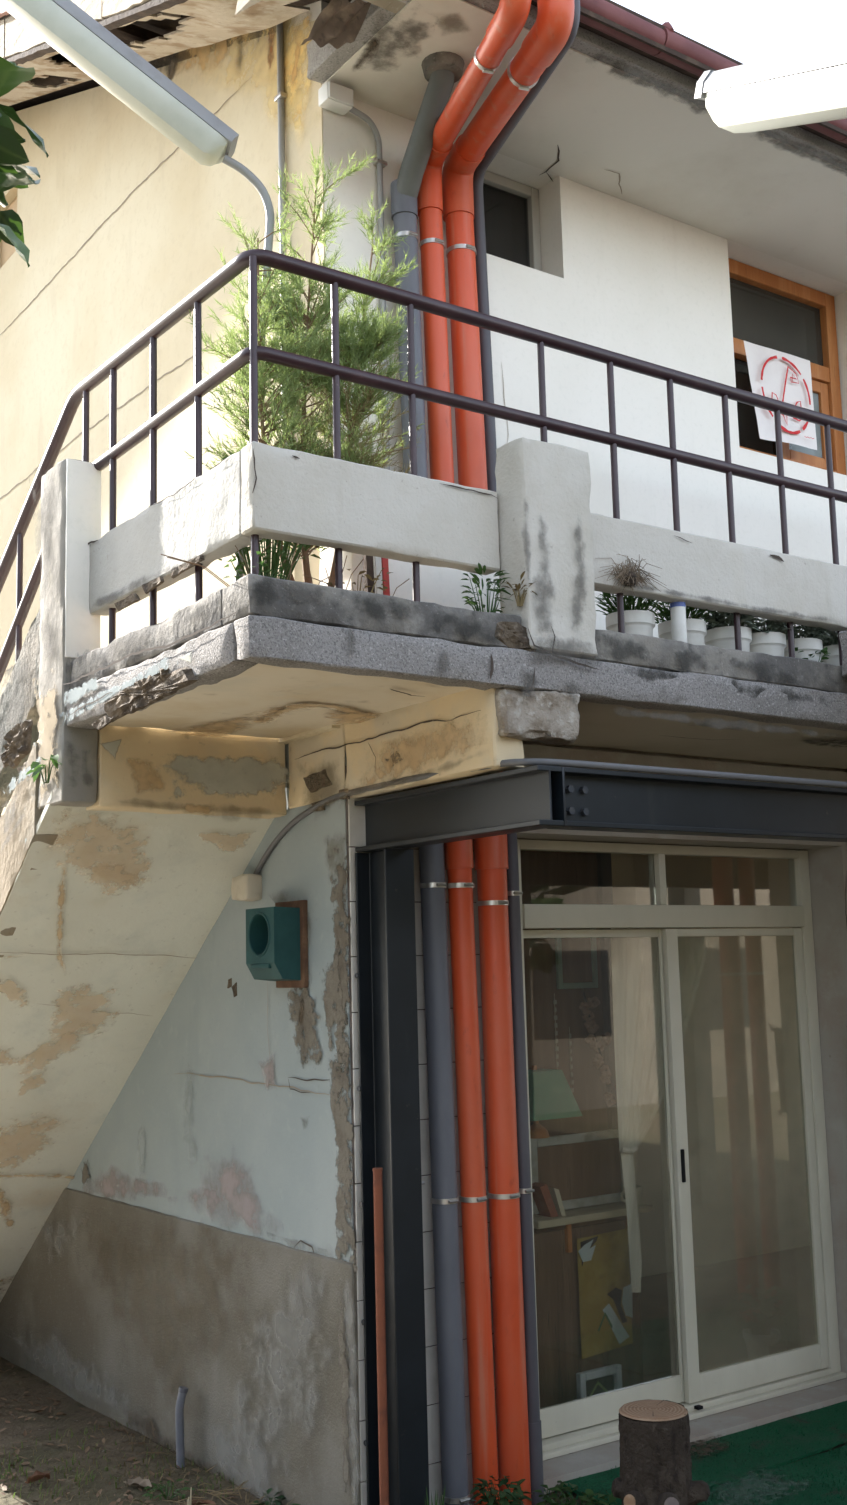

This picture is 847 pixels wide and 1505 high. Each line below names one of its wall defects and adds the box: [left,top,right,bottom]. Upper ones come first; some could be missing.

damp [354,26,426,69]
spalling [1,647,199,799]
damp [356,596,409,617]
crack [298,654,494,765]
damp [524,528,552,626]
damp [525,642,590,696]
crack [528,627,599,684]
damp [574,528,584,623]
peeling [164,755,350,811]
crack [178,981,329,1095]
flaking render [323,849,358,1495]
damp [129,1271,323,1502]